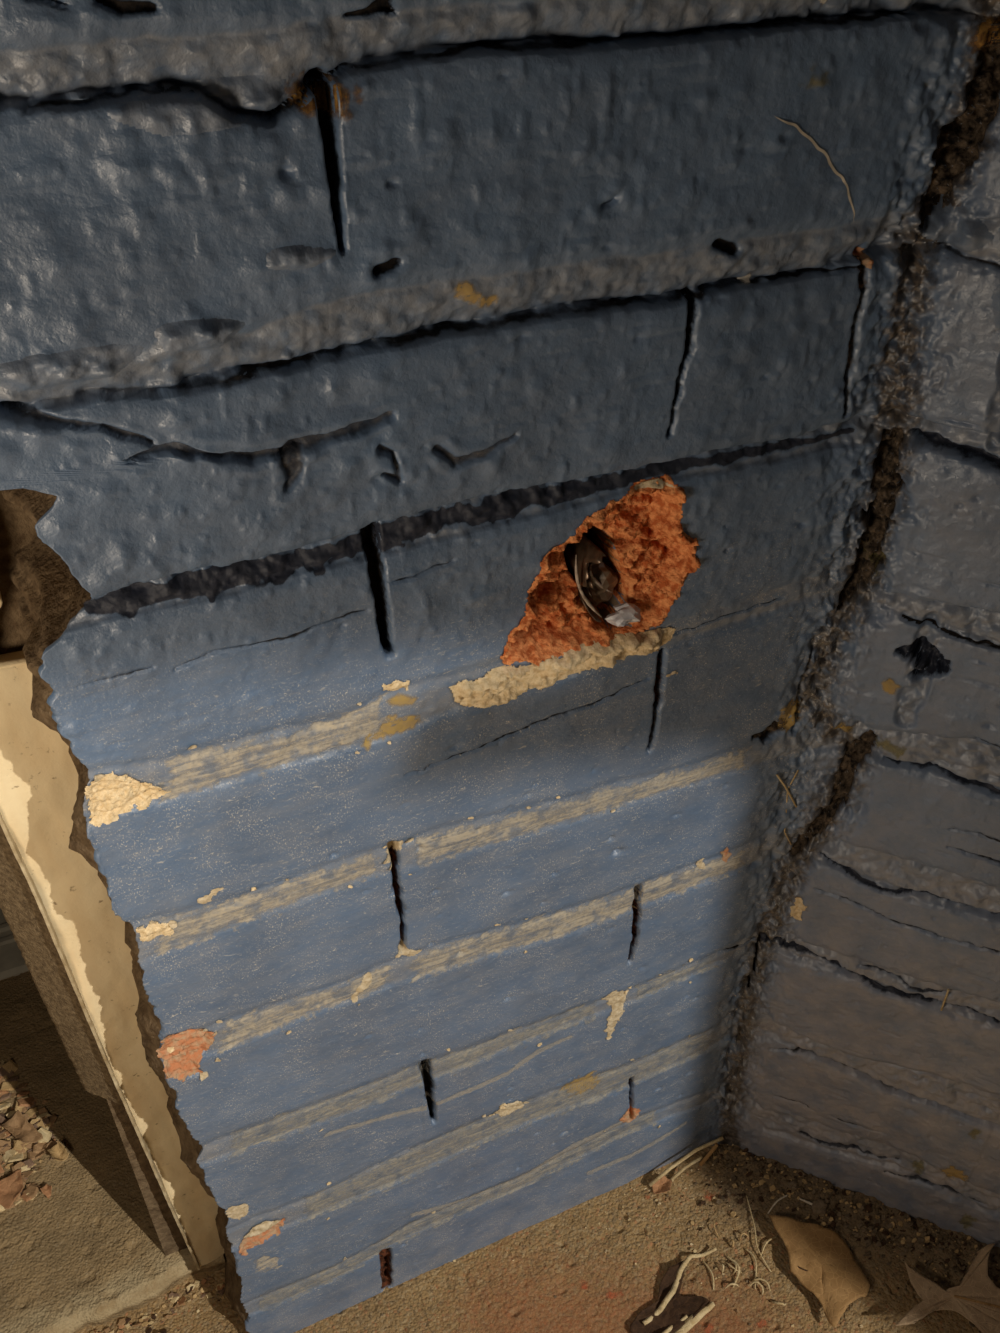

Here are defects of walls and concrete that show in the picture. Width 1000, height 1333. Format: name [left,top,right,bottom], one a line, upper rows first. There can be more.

crack [259,62,380,248]
crack [919,16,1000,268]
crack [84,255,1000,653]
spalling [449,474,701,708]
peeling [84,680,410,827]
crack [388,845,404,942]
crack [418,1059,434,1118]
peeling [136,751,743,956]
peeling [156,848,744,1082]
peeling [229,956,718,1157]
crack [789,730,1000,934]
spalling [225,1204,286,1256]